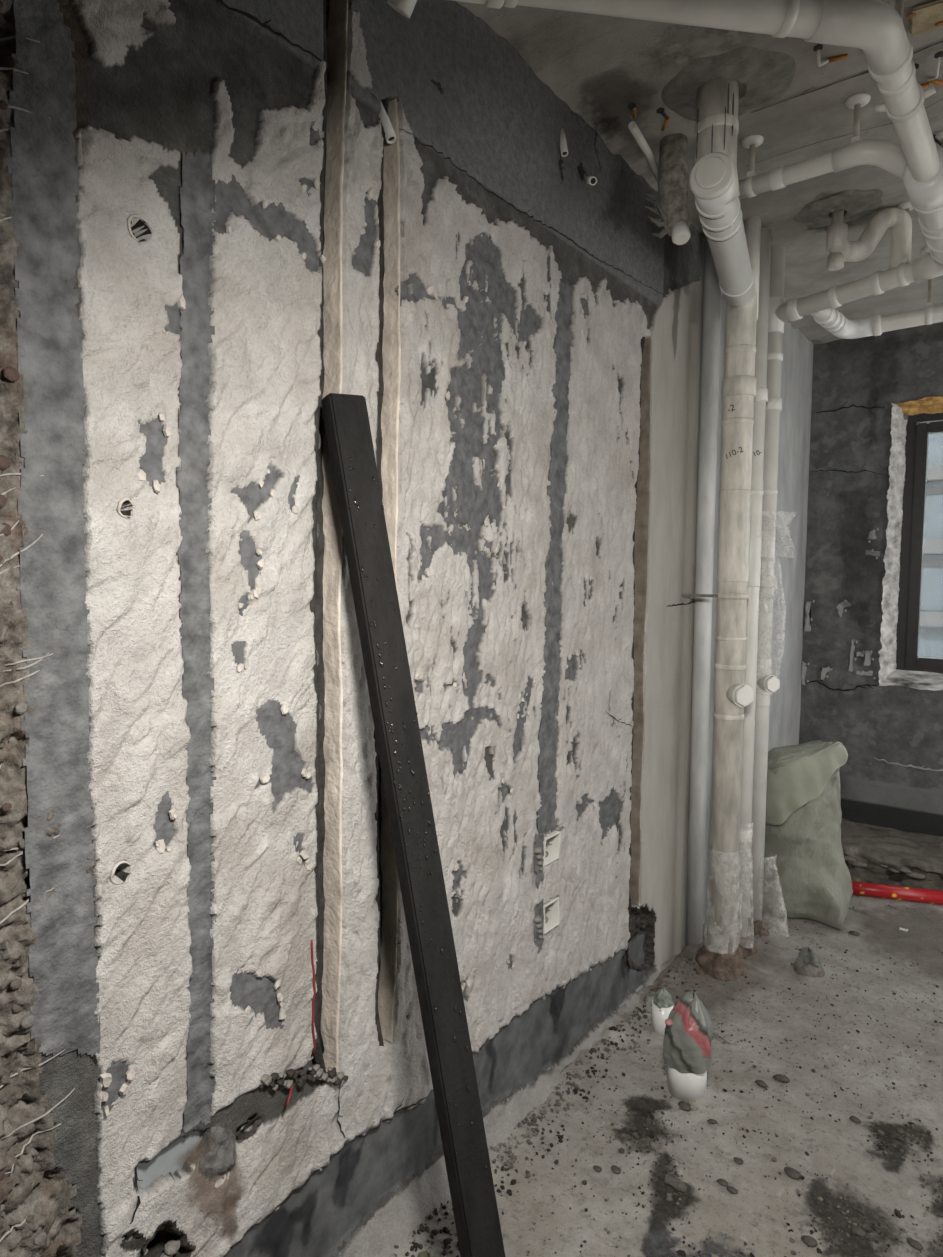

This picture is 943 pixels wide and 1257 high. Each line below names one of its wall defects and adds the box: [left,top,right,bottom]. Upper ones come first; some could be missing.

damp [653,27,754,66]
spalling [135,413,171,493]
spalling [231,467,301,616]
spalling [396,232,541,778]
spalling [231,641,249,673]
spalling [254,699,312,813]
spalling [576,785,625,845]
spalling [452,860,465,889]
spalling [533,833,544,953]
spalling [626,904,657,971]
corrosion [187,1142,241,1237]
spalling [122,1220,196,1257]